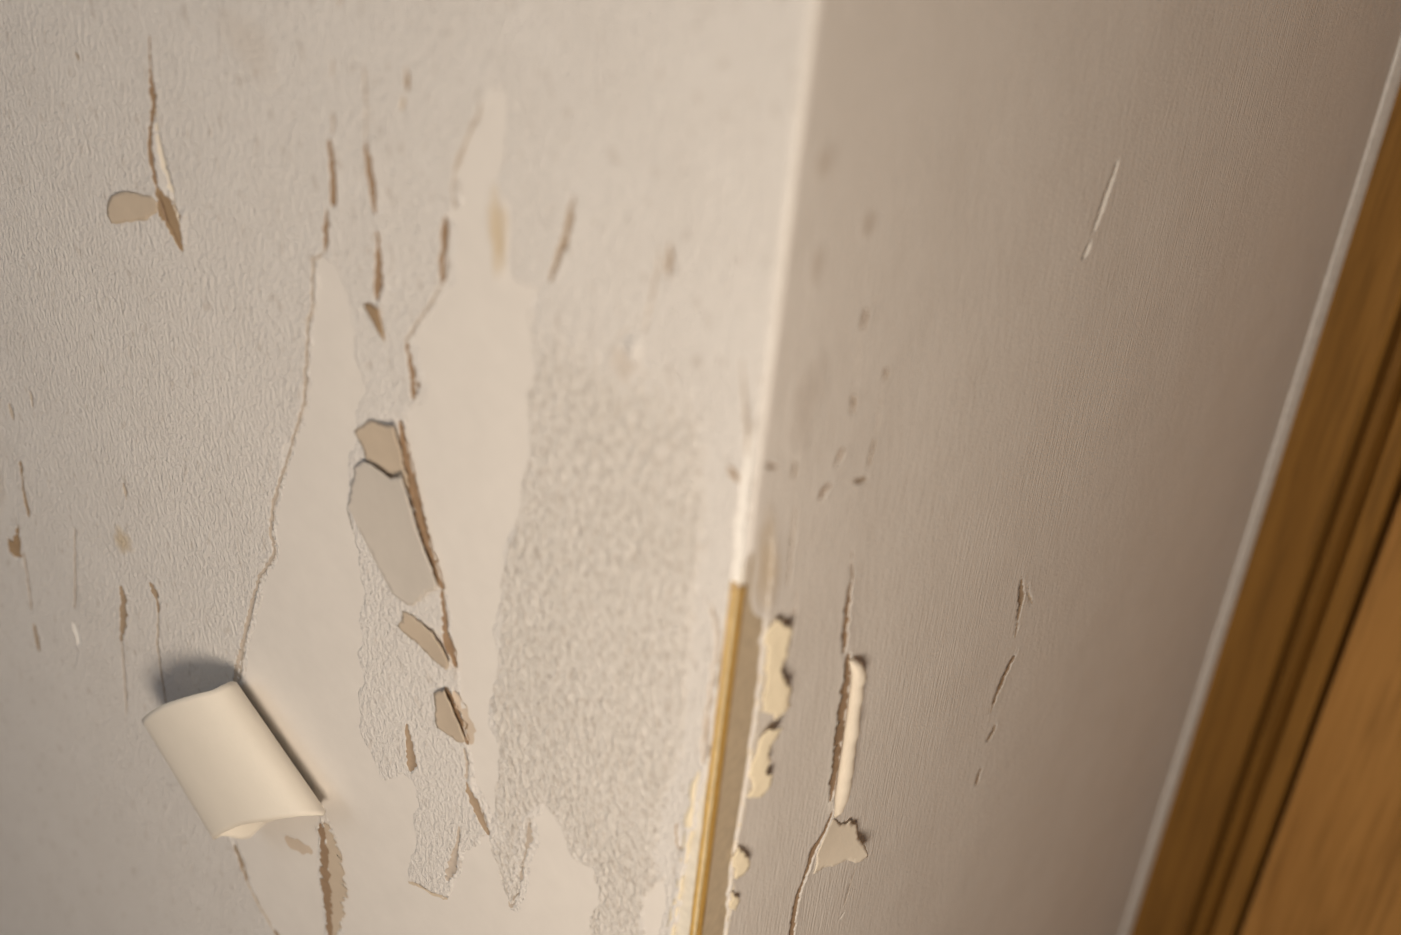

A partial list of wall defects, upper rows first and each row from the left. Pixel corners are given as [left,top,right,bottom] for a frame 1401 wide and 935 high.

crack [107,36,184,252]
peeling [232,89,600,935]
peeling [727,602,793,931]
peeling [789,554,868,935]
crack [975,576,1033,785]
crack [234,845,279,935]
crack [284,823,348,935]